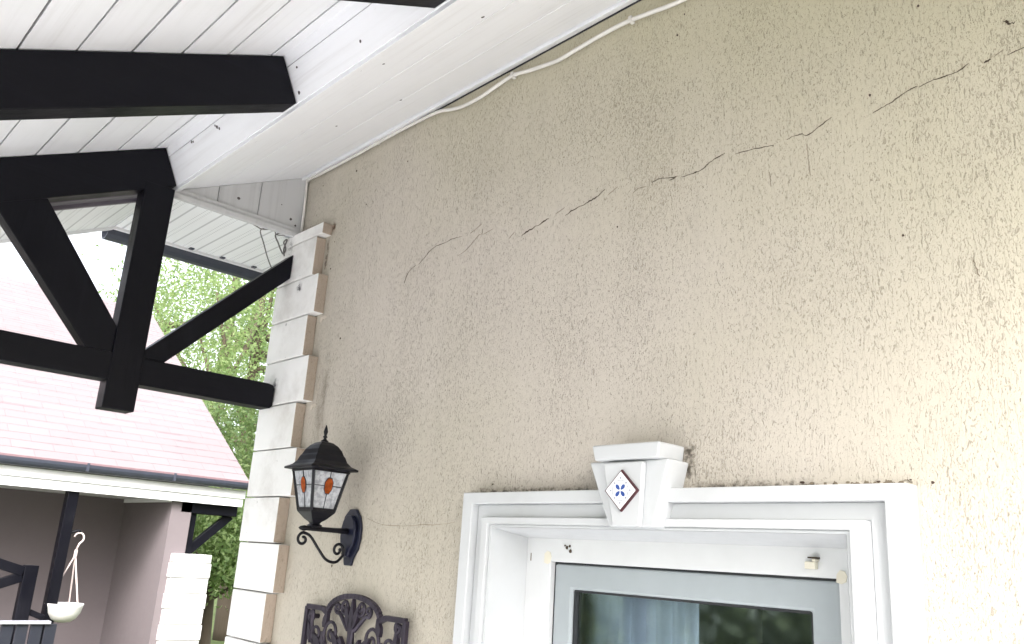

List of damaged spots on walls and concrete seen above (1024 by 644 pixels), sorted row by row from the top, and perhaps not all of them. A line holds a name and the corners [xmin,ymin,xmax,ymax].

crack [873,47,1024,113]
crack [404,117,832,283]